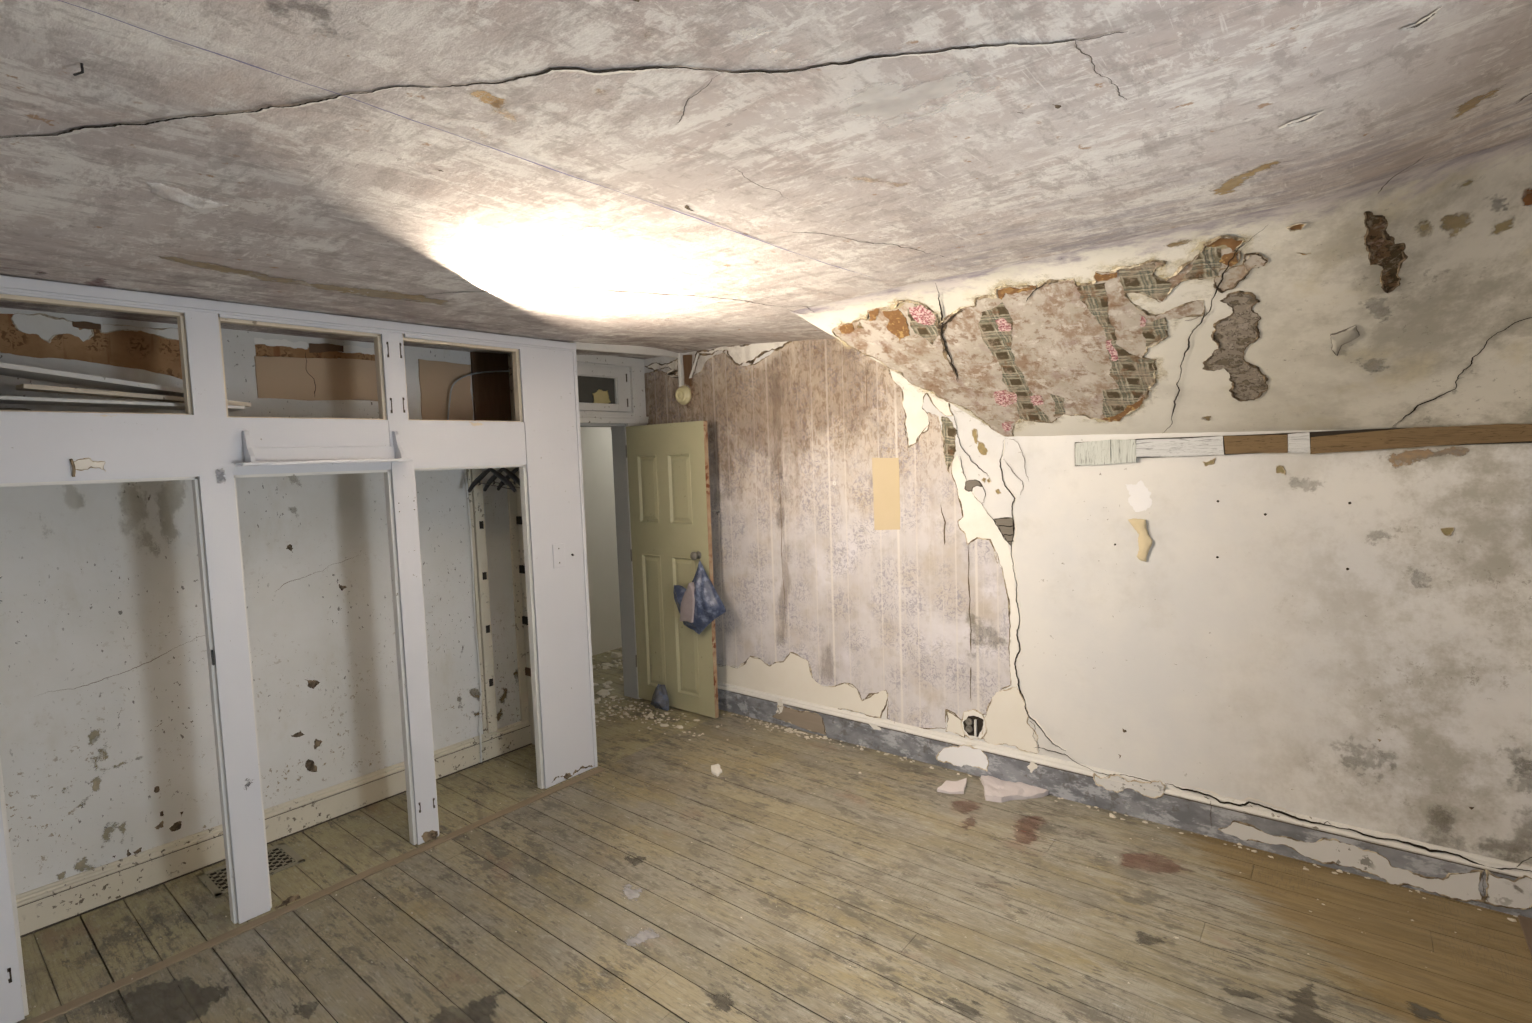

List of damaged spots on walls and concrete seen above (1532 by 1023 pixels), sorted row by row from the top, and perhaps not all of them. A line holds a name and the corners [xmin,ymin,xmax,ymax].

crack [0,32,1127,138]
peeling [888,369,953,447]
spalling [972,429,988,455]
crack [738,170,1532,901]
peeling [936,456,1039,773]
peeling [717,652,888,735]
peeling [1093,755,1166,799]
peeling [1218,820,1532,910]